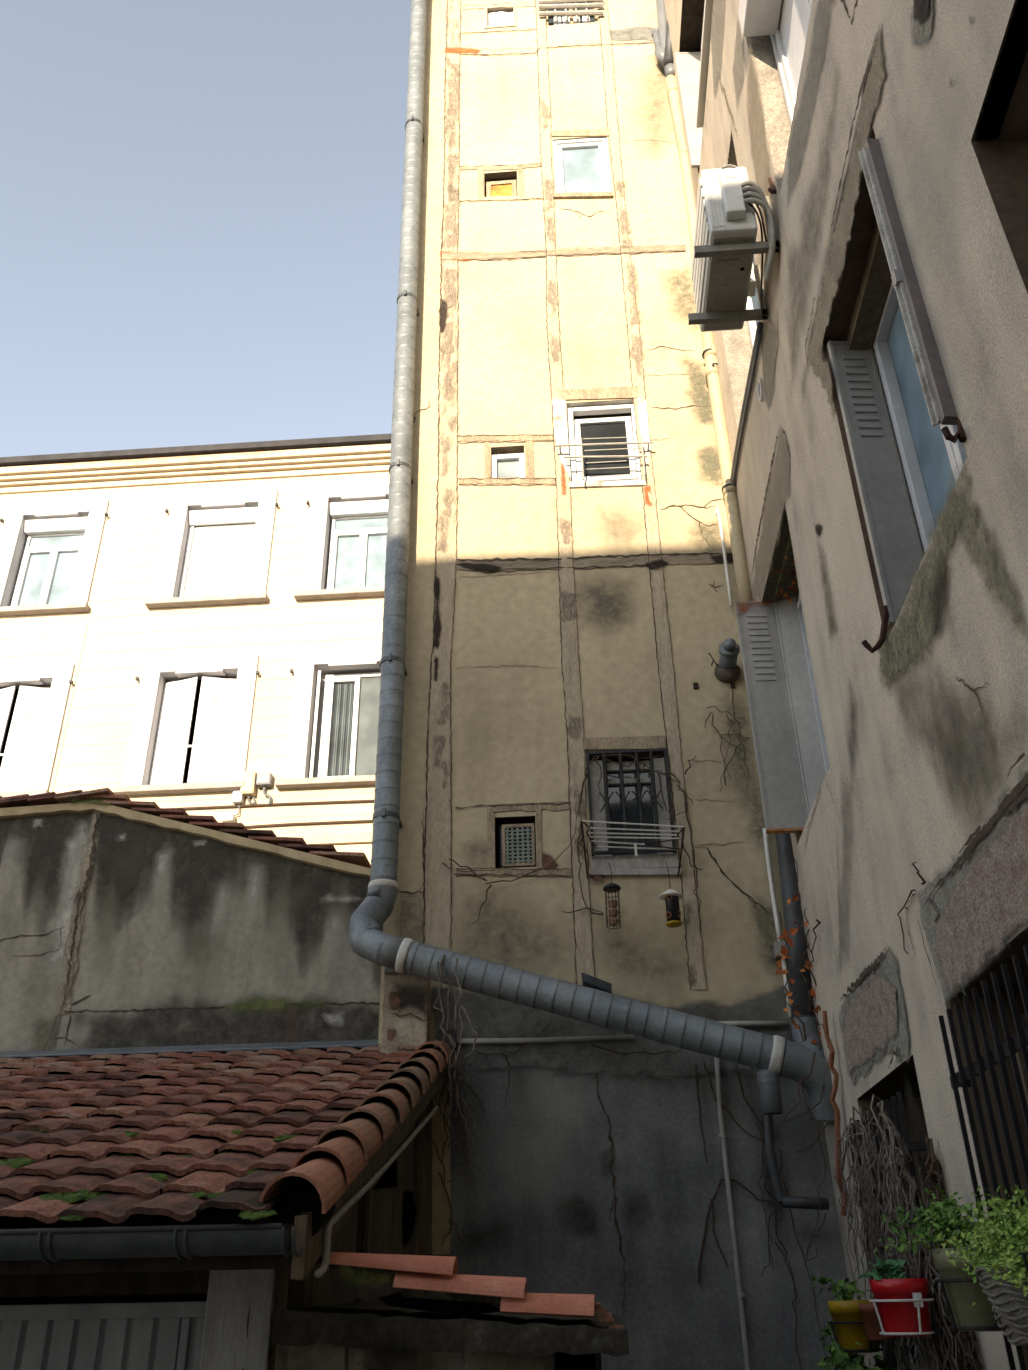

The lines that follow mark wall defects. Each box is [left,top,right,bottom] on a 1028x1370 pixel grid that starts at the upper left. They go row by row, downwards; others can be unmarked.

peeling [443,64,460,247]
peeling [439,269,458,401]
peeling [436,440,453,552]
damp [879,474,1021,687]
damp [0,812,370,961]
spalling [918,753,1028,1001]
spalling [839,948,909,1085]
crack [592,1074,626,1324]